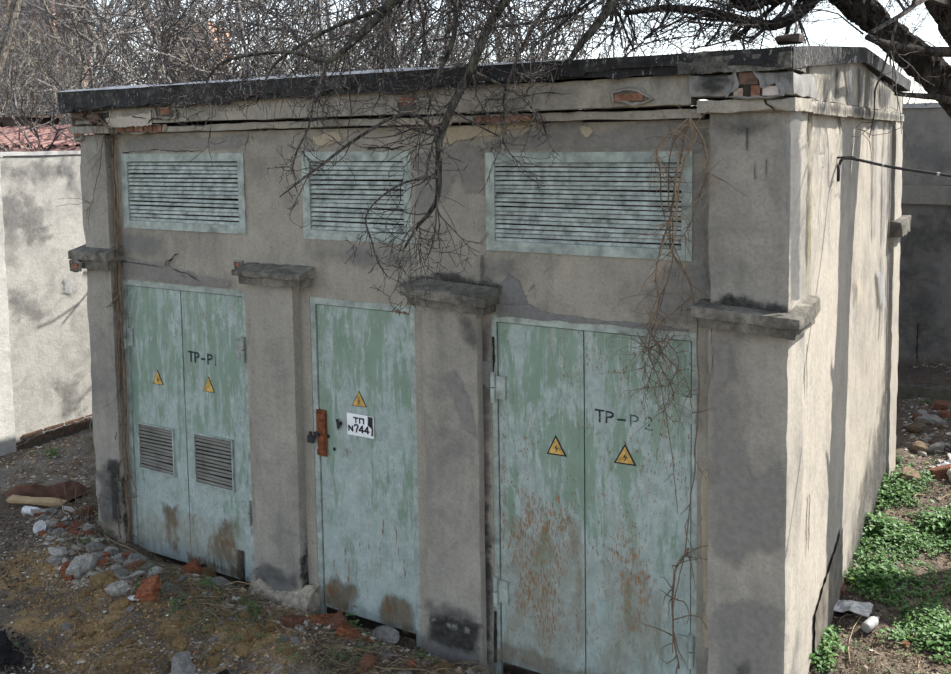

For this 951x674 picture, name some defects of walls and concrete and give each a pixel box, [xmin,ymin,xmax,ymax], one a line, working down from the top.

flaking render [725,71,785,100]
peeling [71,106,178,142]
peeling [387,97,543,144]
damp [814,69,904,254]
damp [4,195,47,242]
damp [426,319,493,663]
corrosion [164,507,177,548]
corrosion [325,546,356,611]
corrosion [502,485,575,639]
corrosion [611,520,653,653]
corrosion [380,596,413,632]